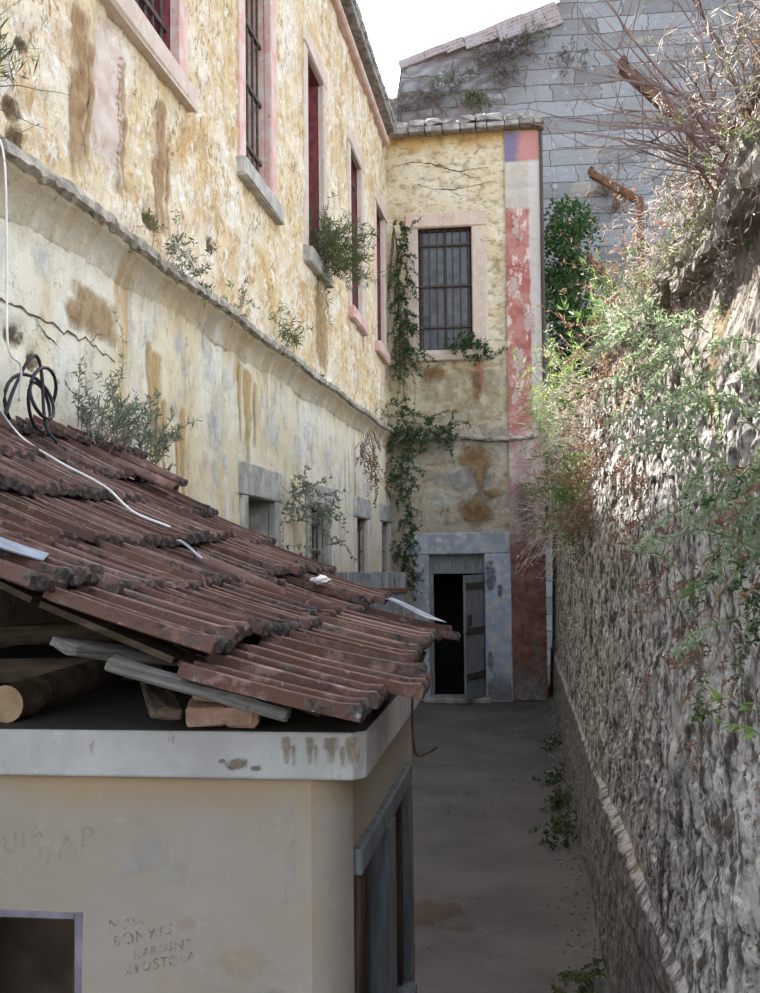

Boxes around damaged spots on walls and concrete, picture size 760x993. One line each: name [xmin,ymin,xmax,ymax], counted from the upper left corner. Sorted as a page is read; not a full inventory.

water stain [70,4,95,167]
water stain [116,59,128,188]
crack [398,162,490,196]
crack [0,298,116,363]
water stain [434,445,500,522]
water stain [306,737,359,764]